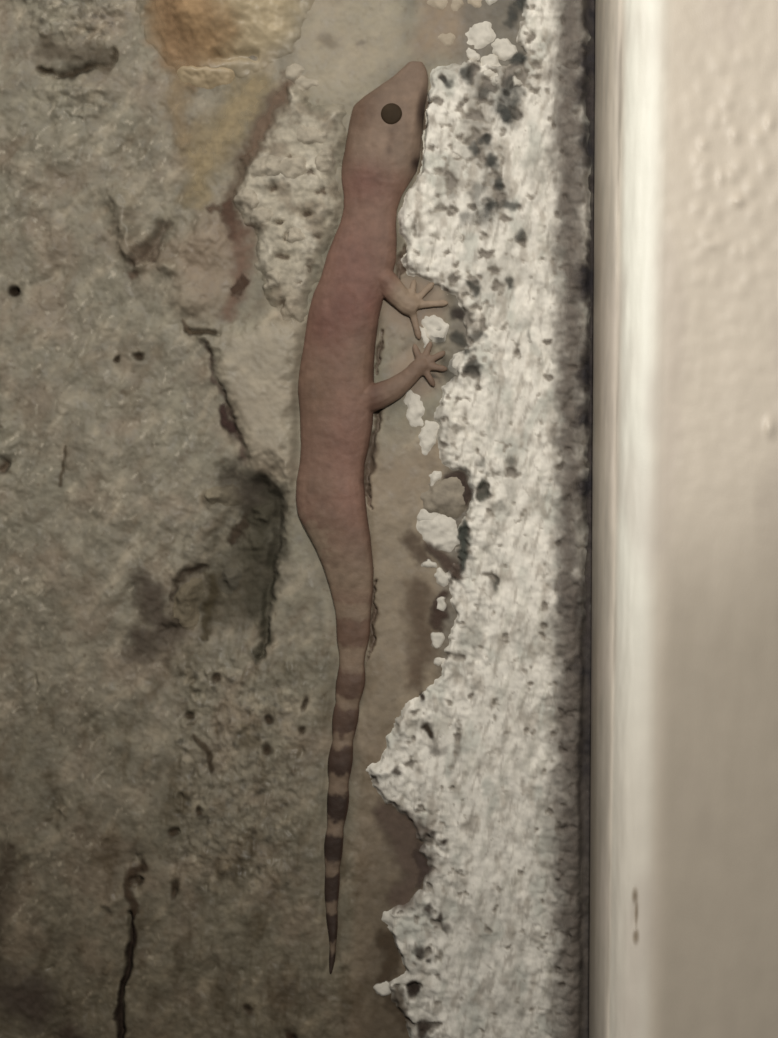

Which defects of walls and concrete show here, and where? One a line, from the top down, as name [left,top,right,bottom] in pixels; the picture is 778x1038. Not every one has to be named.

spalling [232,63,348,323]
crack [182,319,246,458]
leakage [132,576,184,659]
spalling [169,475,284,662]
crack [113,862,147,1038]